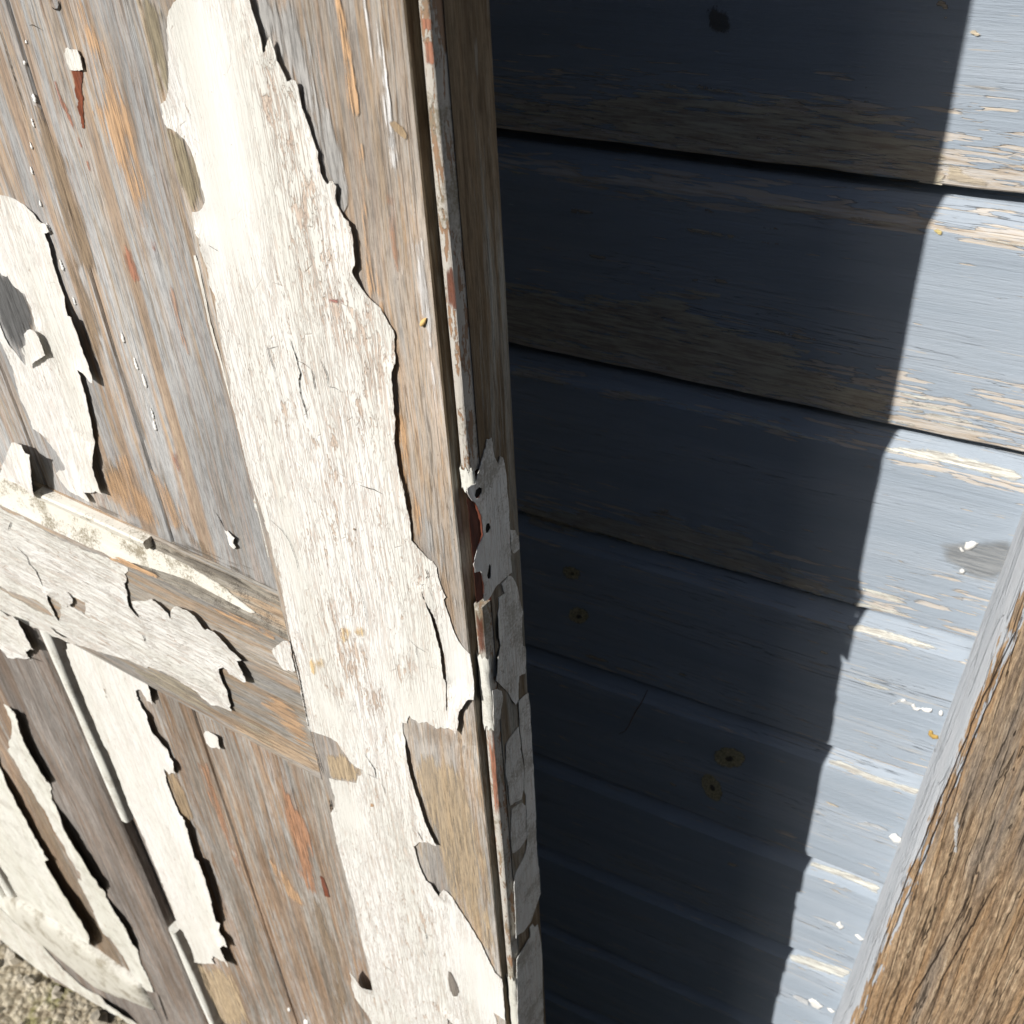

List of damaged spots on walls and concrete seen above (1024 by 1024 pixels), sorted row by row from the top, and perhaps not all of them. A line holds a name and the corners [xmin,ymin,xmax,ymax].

rust [72,70,84,129]
peeling [0,195,102,502]
peeling [160,0,544,1024]
peeling [0,442,255,992]
peeling [0,908,136,1024]